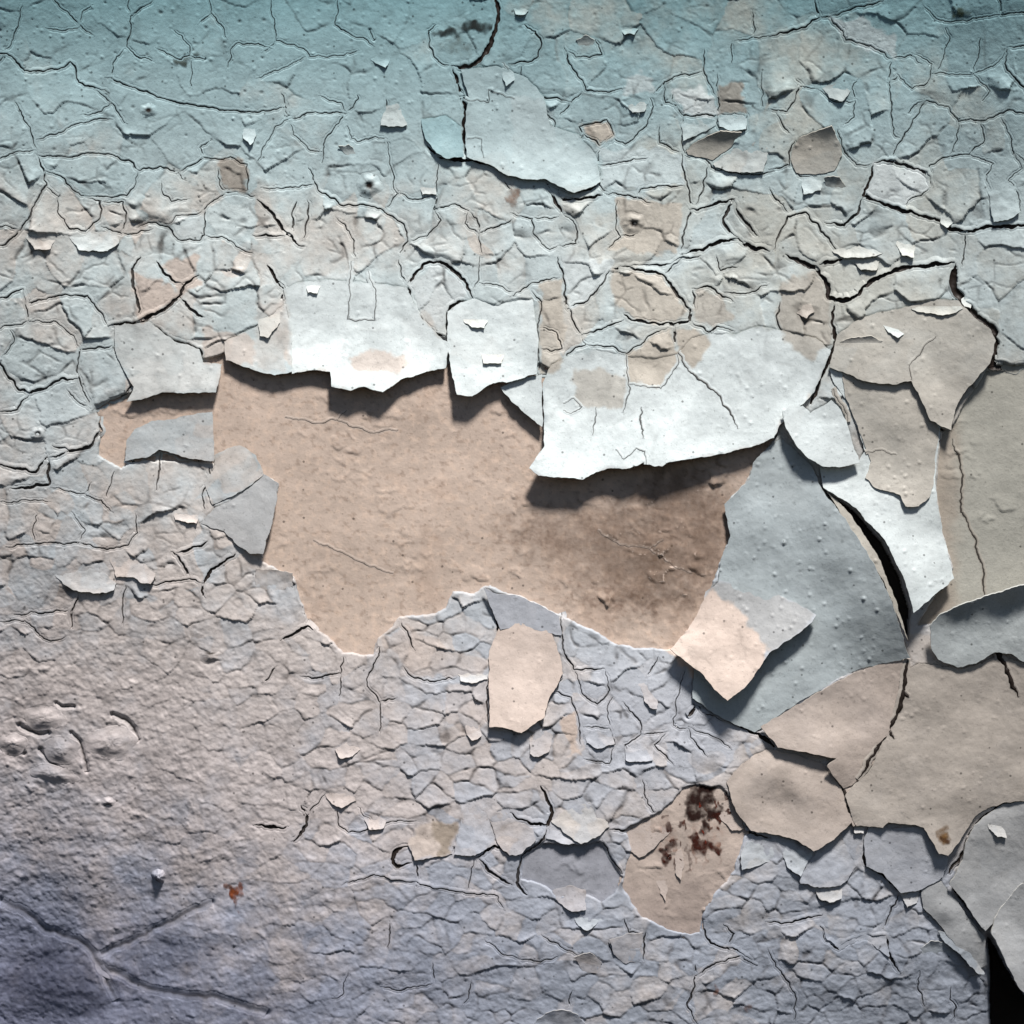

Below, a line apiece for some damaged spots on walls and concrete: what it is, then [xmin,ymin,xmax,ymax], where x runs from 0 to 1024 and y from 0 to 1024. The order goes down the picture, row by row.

crack [0,0,1024,552]
peeling [55,558,156,594]
crack [119,539,238,628]
crack [261,618,458,736]
peeling [97,280,1024,992]
crack [993,652,1021,698]
crack [554,611,778,877]
rust [224,882,243,902]
crack [252,784,556,910]
rust [659,785,731,865]
crack [684,659,958,1024]
crack [0,897,268,1018]